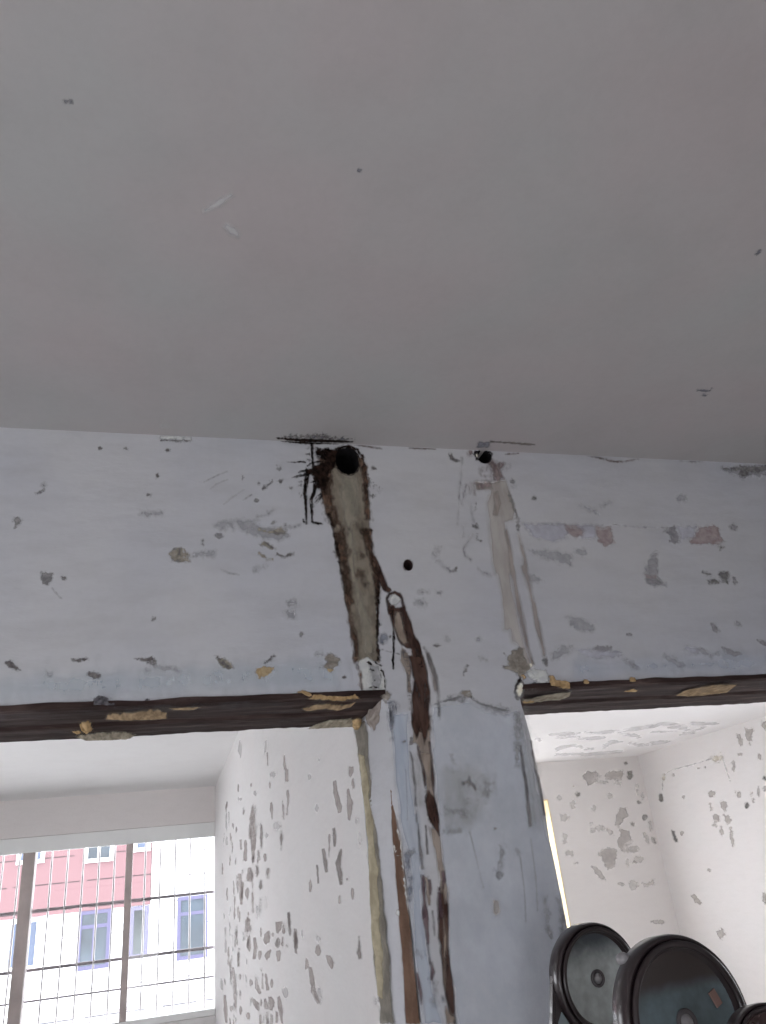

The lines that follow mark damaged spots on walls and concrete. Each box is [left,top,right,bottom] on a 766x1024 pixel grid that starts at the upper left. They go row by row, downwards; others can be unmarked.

crack [282,441,378,449]
spalling [169,533,222,562]
peeling [238,521,292,560]
peeling [665,525,737,548]
spalling [41,573,66,585]
rust [294,442,456,1024]
peeling [732,722,766,770]
peeling [333,767,354,820]
peeling [550,722,715,879]
peeling [708,777,766,846]
peeling [309,828,354,903]
peeling [221,761,333,1024]